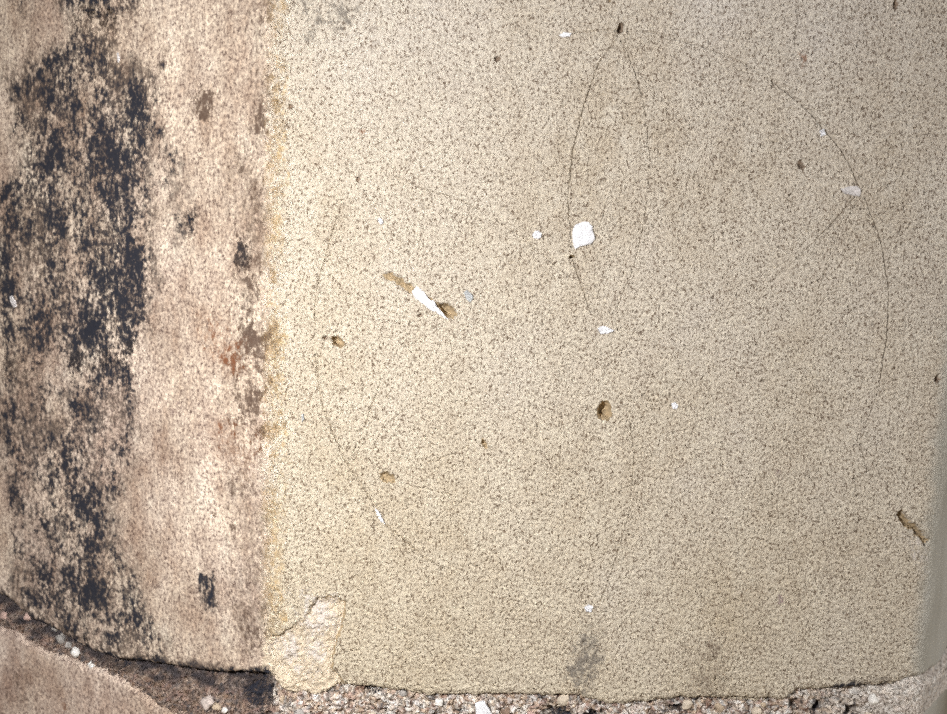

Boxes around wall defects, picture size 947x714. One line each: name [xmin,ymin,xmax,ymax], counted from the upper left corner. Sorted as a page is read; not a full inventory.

leakage [0,0,274,674]
leakage [232,591,340,675]
spalling [261,595,347,694]